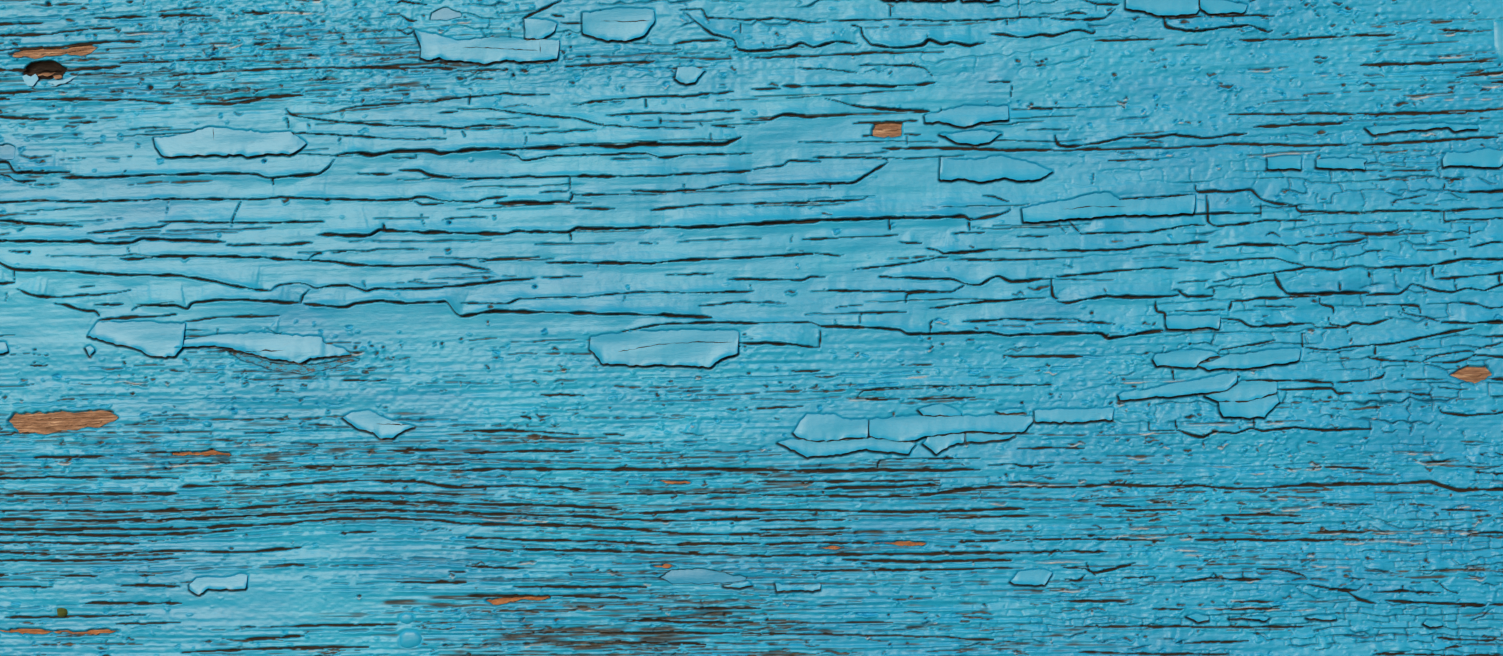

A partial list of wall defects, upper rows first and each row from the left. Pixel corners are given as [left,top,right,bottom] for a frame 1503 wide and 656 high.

peeling [13,45,98,86]
peeling [873,123,902,138]
crack [0,0,1503,417]
peeling [1451,367,1492,383]
peeling [10,410,119,435]
crack [0,393,1503,656]